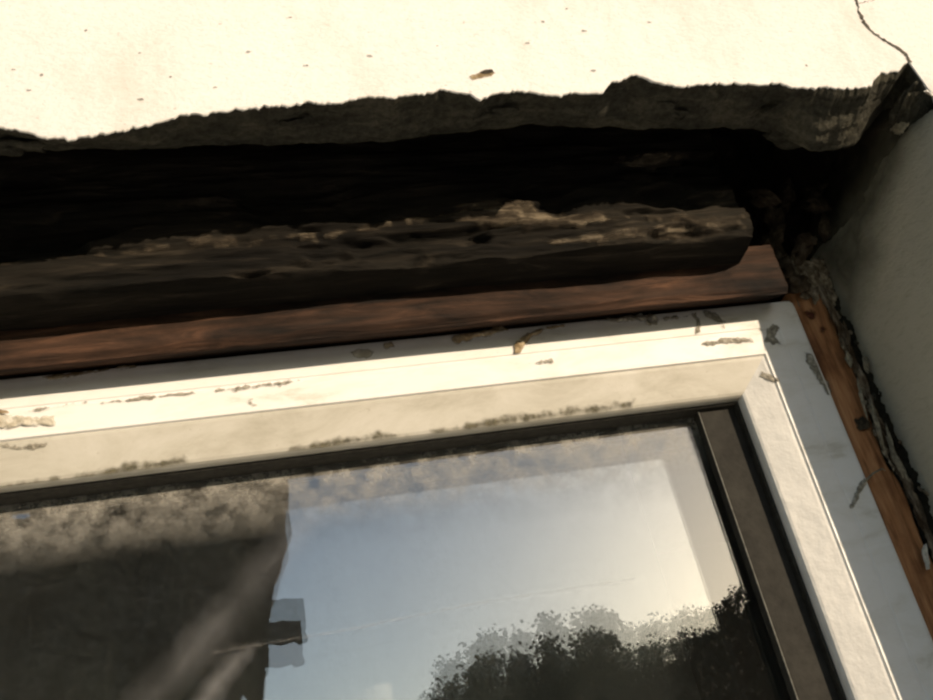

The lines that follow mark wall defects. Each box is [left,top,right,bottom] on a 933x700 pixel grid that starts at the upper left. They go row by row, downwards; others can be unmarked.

crack [855,0,912,62]
flaking render [0,63,933,570]